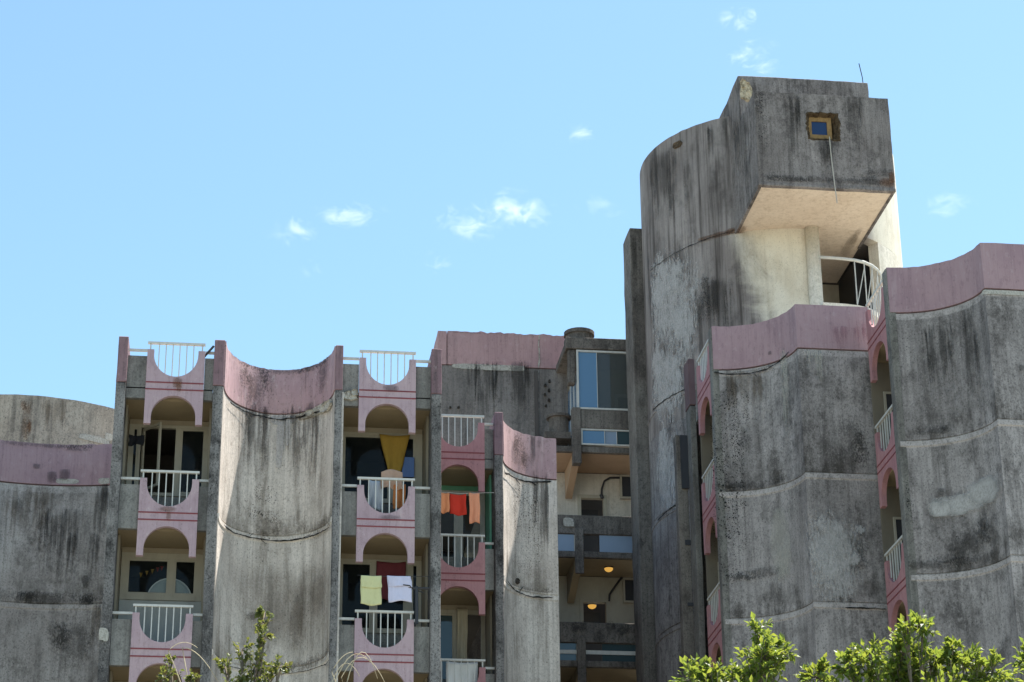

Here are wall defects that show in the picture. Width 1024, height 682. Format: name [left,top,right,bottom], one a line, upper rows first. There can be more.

spalling [740,78,768,147]
crack [650,232,729,271]
damp [651,254,703,515]
damp [806,512,865,602]